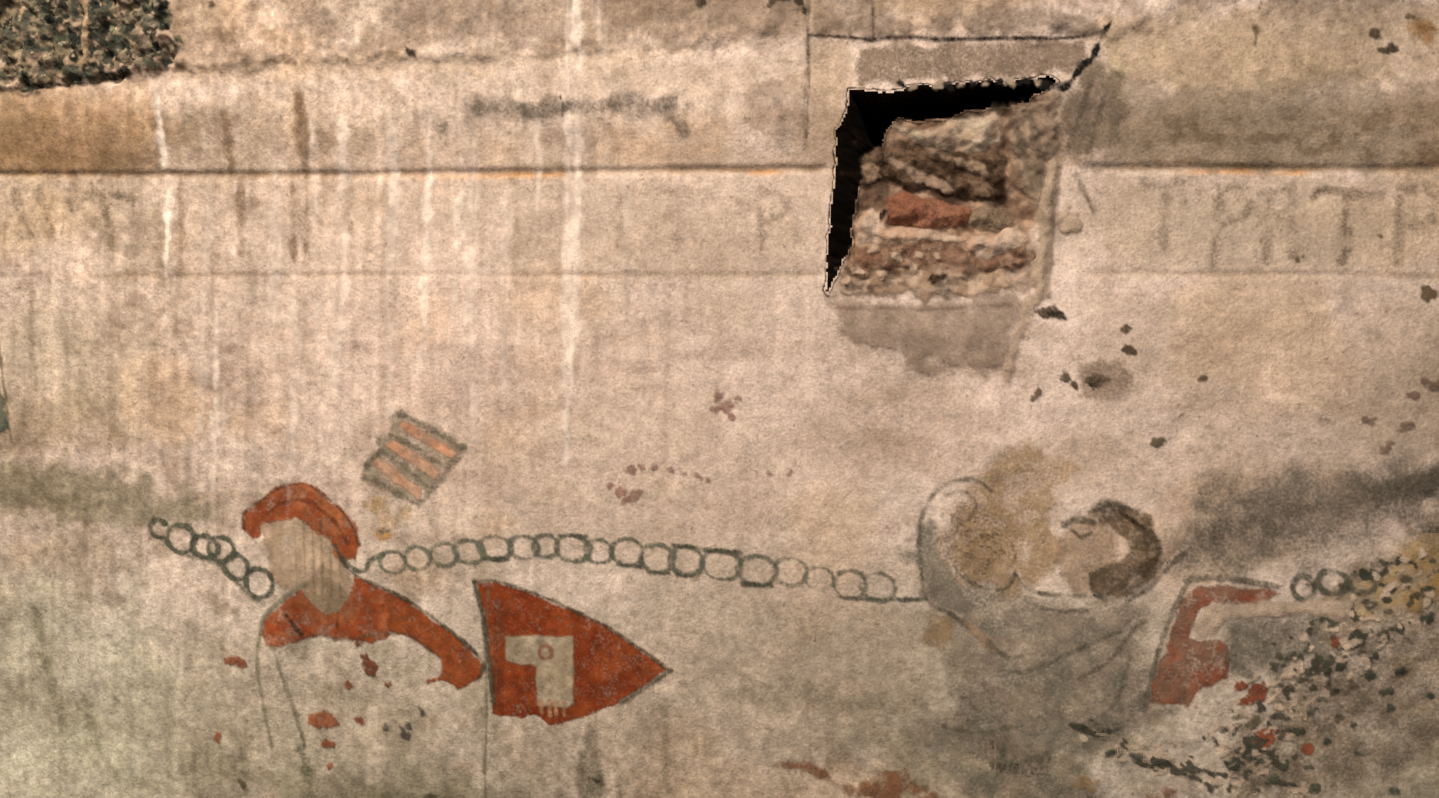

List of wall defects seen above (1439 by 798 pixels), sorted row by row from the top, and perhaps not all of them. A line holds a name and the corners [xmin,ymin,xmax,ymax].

flaking render [0,0,183,96]
damp [153,95,182,291]
damp [196,289,229,492]
damp [294,92,314,172]
damp [269,116,353,477]
damp [385,113,400,291]
damp [417,100,444,376]
damp [452,143,480,348]
damp [518,0,585,466]
spalling [822,22,1123,319]
damp [1160,463,1439,573]